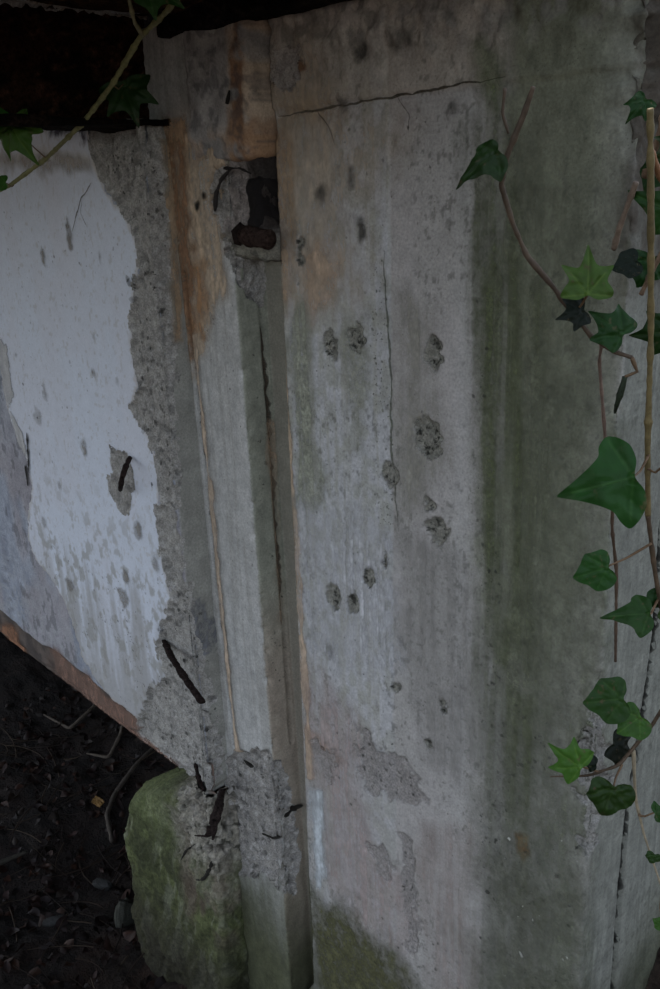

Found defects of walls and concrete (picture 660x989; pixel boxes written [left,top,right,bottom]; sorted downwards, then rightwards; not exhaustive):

crack [283,77,502,145]
corrosion [162,117,241,752]
spalling [88,125,302,897]
crack [652,531,660,572]
crack [640,609,659,718]
spalling [570,708,615,858]
crack [610,809,628,989]